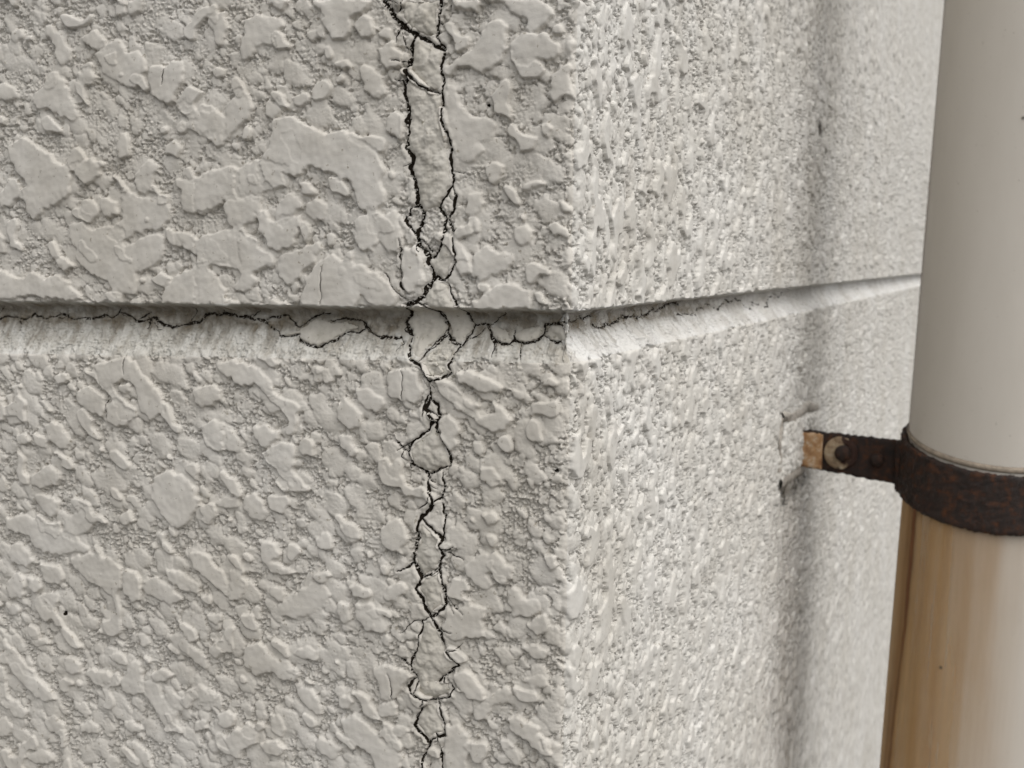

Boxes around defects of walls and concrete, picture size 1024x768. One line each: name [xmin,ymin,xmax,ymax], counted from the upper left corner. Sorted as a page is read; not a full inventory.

crack [0,0,784,768]